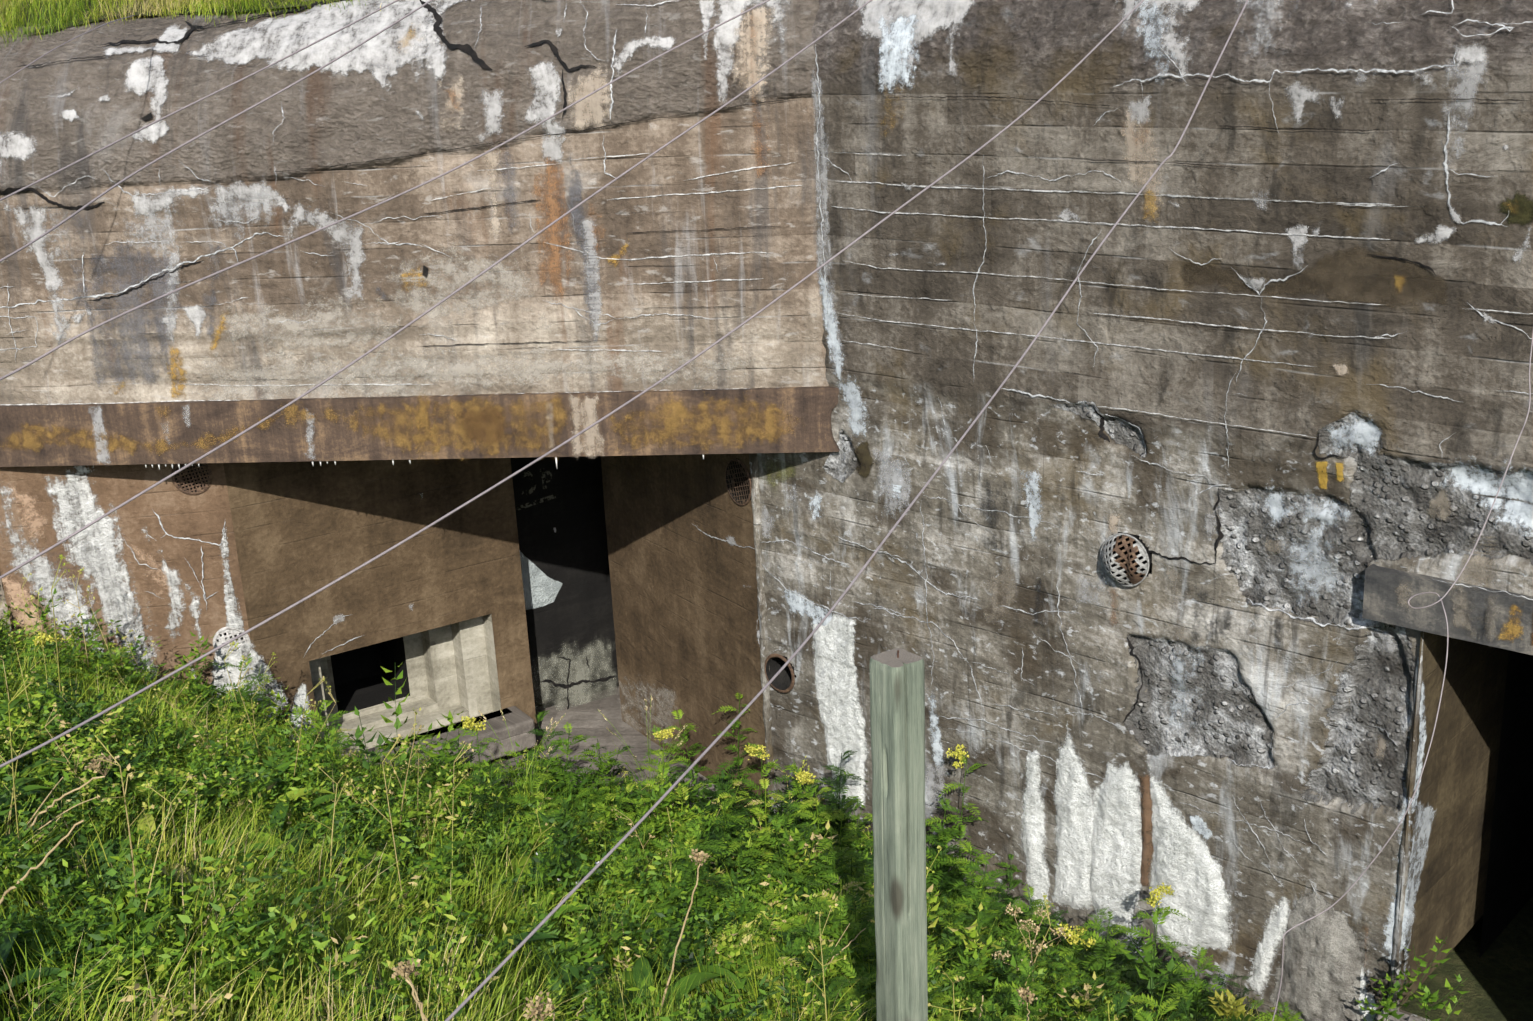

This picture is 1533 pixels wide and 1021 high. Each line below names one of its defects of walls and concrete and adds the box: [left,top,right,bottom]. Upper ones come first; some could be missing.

crack [18,0,343,67]
water stain [105,0,466,125]
crack [0,160,332,362]
corrosion [534,157,628,335]
crack [272,0,1533,565]
corrosion [8,424,170,452]
crack [1,383,448,405]
corrosion [194,397,566,455]
corrosion [612,400,791,447]
water stain [0,408,201,683]
water stain [189,529,315,754]
water stain [1021,725,1232,957]